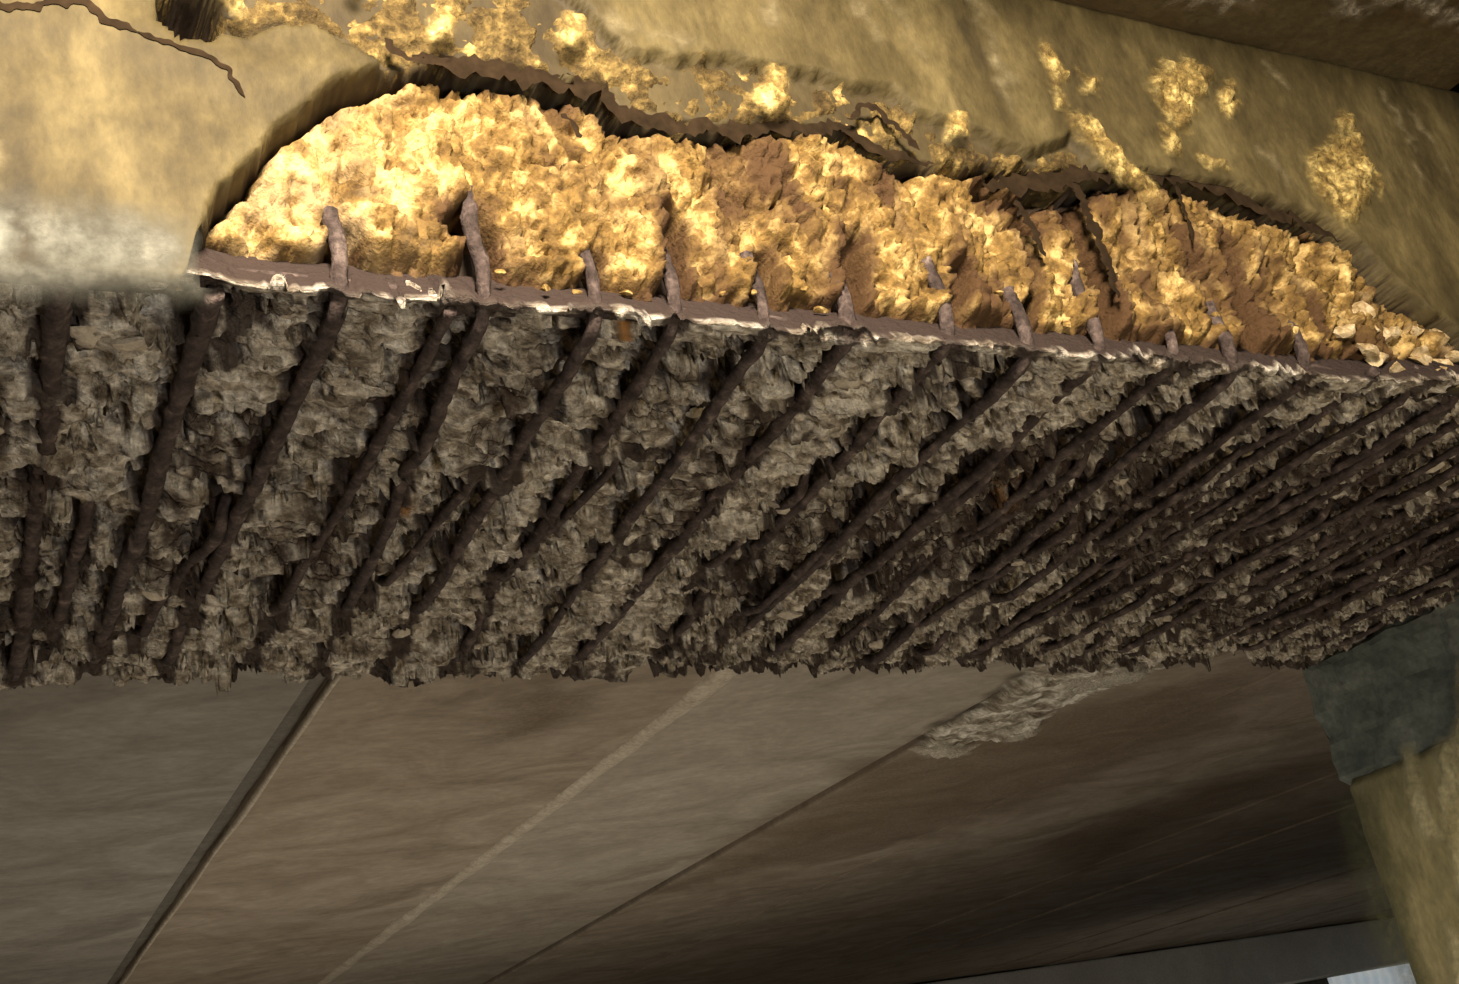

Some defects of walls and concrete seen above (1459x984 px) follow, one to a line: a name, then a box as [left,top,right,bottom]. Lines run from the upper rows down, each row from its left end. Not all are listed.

crack [0,0,245,97]
corrosion [365,348,434,431]
corrosion [489,372,542,423]
spalling [0,0,1459,759]
corrosion [145,408,262,584]
corrosion [271,494,365,596]
corrosion [655,403,787,530]
corrosion [723,414,1459,644]